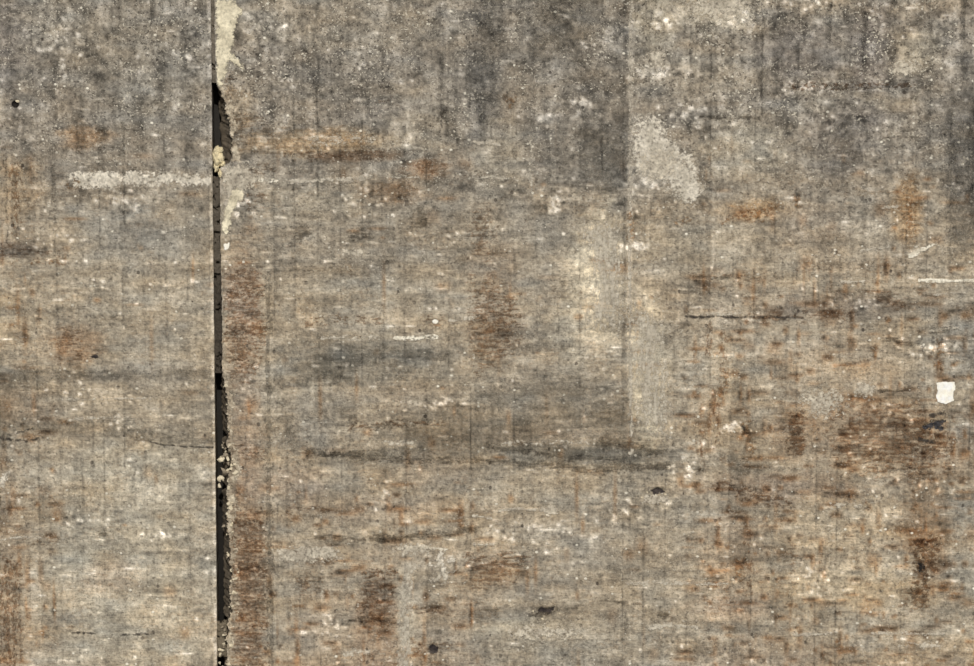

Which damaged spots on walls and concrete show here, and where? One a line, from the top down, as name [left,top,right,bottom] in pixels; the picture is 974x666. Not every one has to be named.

spalling [217,86,241,164]